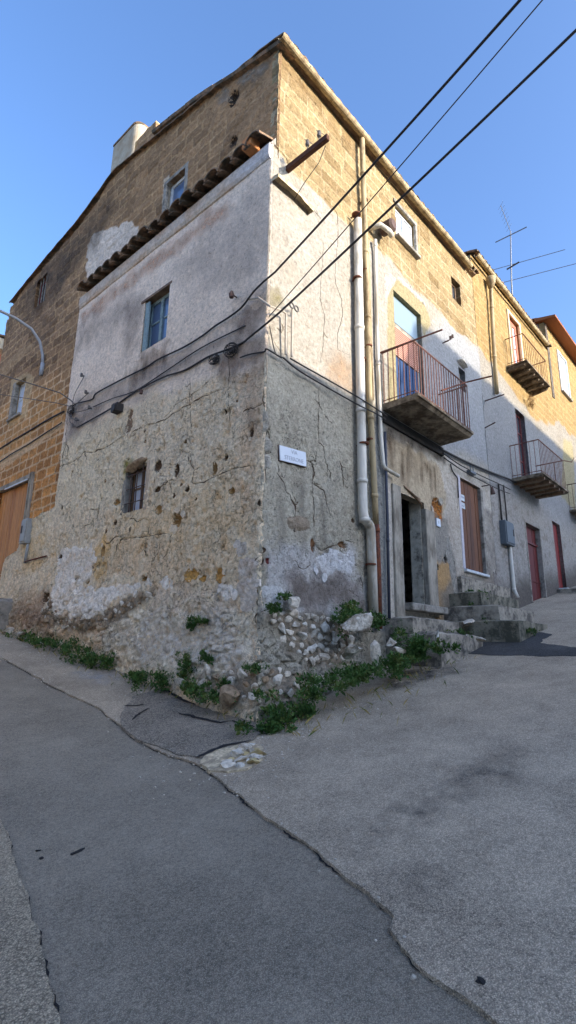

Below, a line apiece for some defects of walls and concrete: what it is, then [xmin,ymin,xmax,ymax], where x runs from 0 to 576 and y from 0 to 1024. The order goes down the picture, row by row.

spalling [125,406,146,443]
spalling [155,455,197,535]
crack [61,355,363,596]
peeling [43,520,239,624]
peeling [233,540,269,577]
peeling [310,539,355,583]